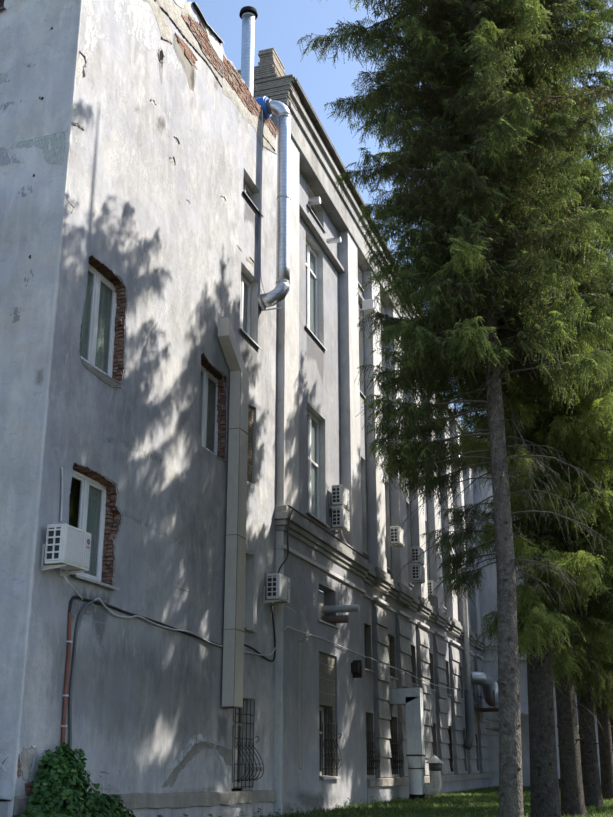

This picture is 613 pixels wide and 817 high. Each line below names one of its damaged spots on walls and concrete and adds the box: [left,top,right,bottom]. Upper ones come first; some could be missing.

flaking render [113,0,277,152]
peeling [0,105,91,165]
spalling [79,233,255,385]
spalling [199,352,228,462]
spalling [66,462,127,589]
crack [0,757,14,802]
peeling [17,745,38,796]